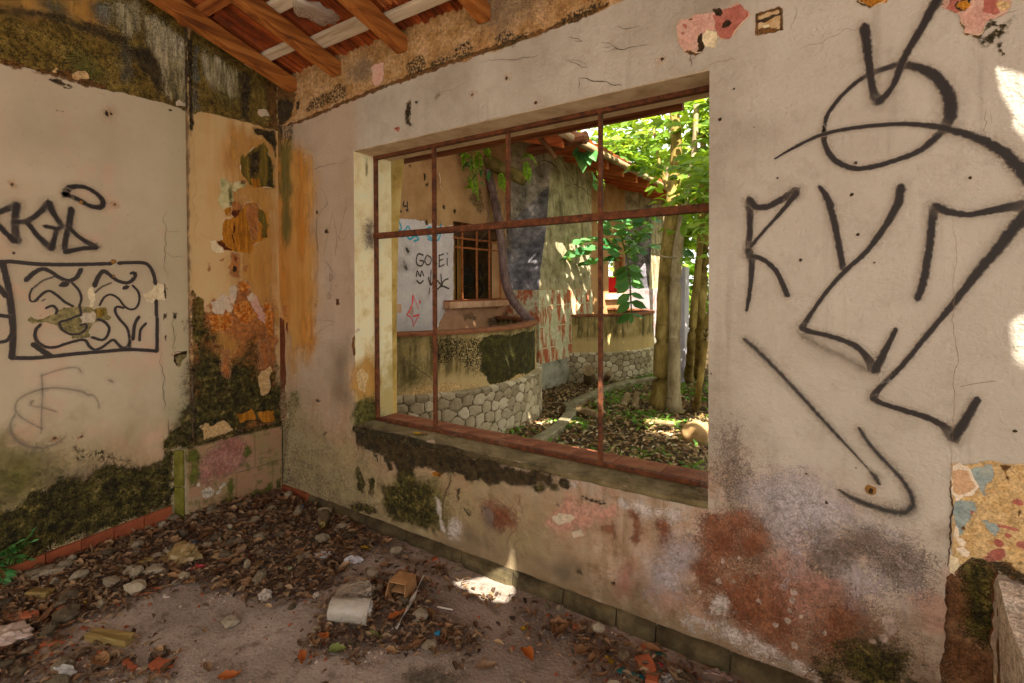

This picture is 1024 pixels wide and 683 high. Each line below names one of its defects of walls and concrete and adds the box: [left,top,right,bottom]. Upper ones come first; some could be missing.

mould [0,0,300,158]
peeling [277,0,624,128]
peeling [676,2,751,56]
peeling [210,142,275,253]
flaking render [280,305,288,428]
damp [0,444,144,513]
damp [163,313,574,568]
damp [611,411,942,683]
peeling [939,460,1024,683]